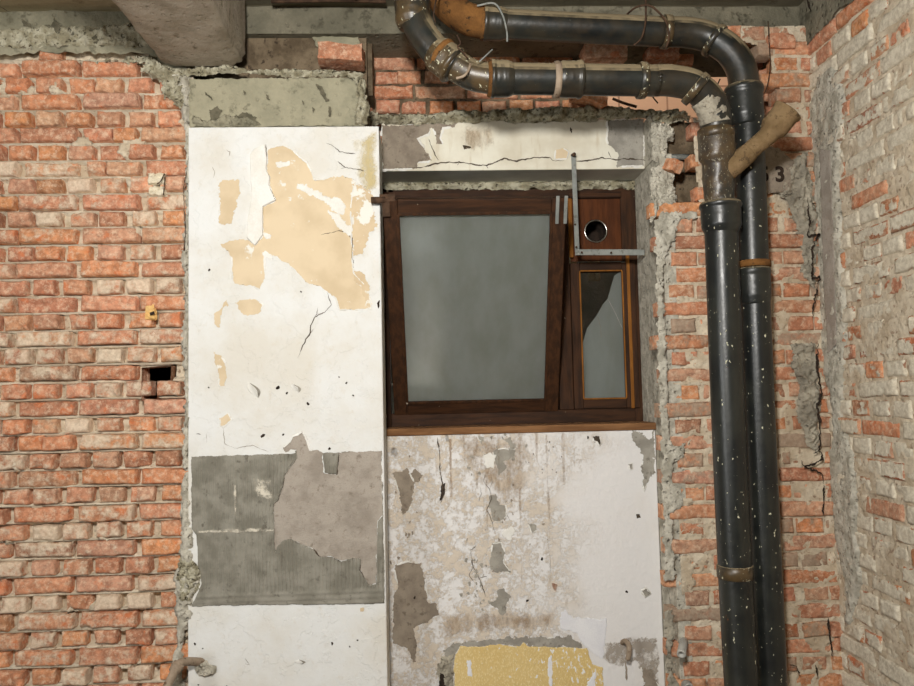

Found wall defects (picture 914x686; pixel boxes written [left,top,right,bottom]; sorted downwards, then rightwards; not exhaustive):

crack [398,140,645,169]
crack [784,192,821,318]
crack [298,295,332,357]
flaking render [0,17,698,686]
crack [801,343,825,515]